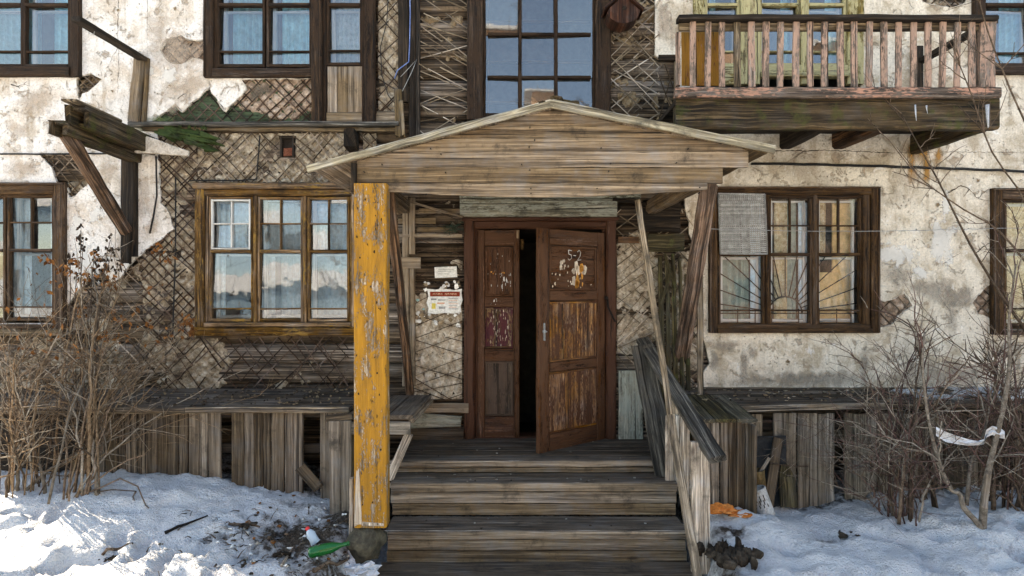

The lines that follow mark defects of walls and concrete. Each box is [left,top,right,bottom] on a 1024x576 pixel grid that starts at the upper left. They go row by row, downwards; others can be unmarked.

spalling [150,36,203,88]
spalling [76,73,114,100]
spalling [360,132,377,150]
rust [907,146,941,181]
spalling [0,78,349,393]
spalling [880,293,912,327]
spalling [971,286,990,320]
water stain [711,343,754,372]